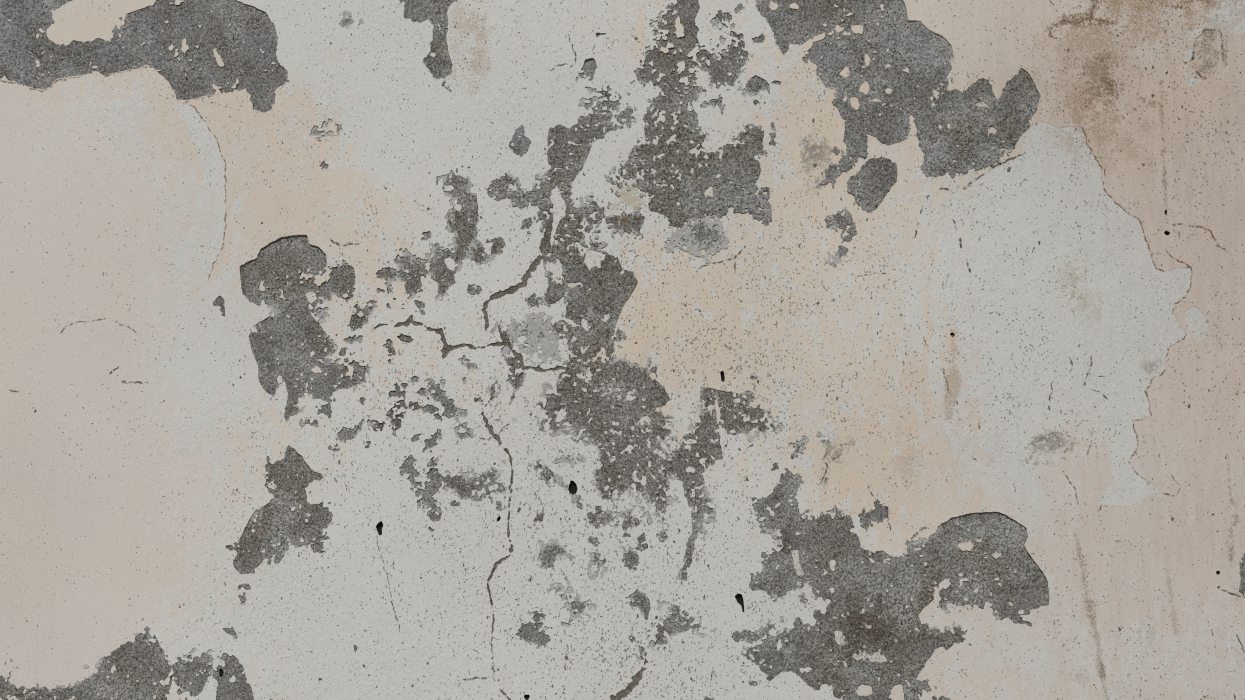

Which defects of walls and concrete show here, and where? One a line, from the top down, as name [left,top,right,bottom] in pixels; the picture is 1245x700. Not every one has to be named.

peeling [0,0,290,113]
water stain [1048,0,1116,30]
peeling [225,0,1209,700]
crack [373,238,569,700]
peeling [0,626,254,700]